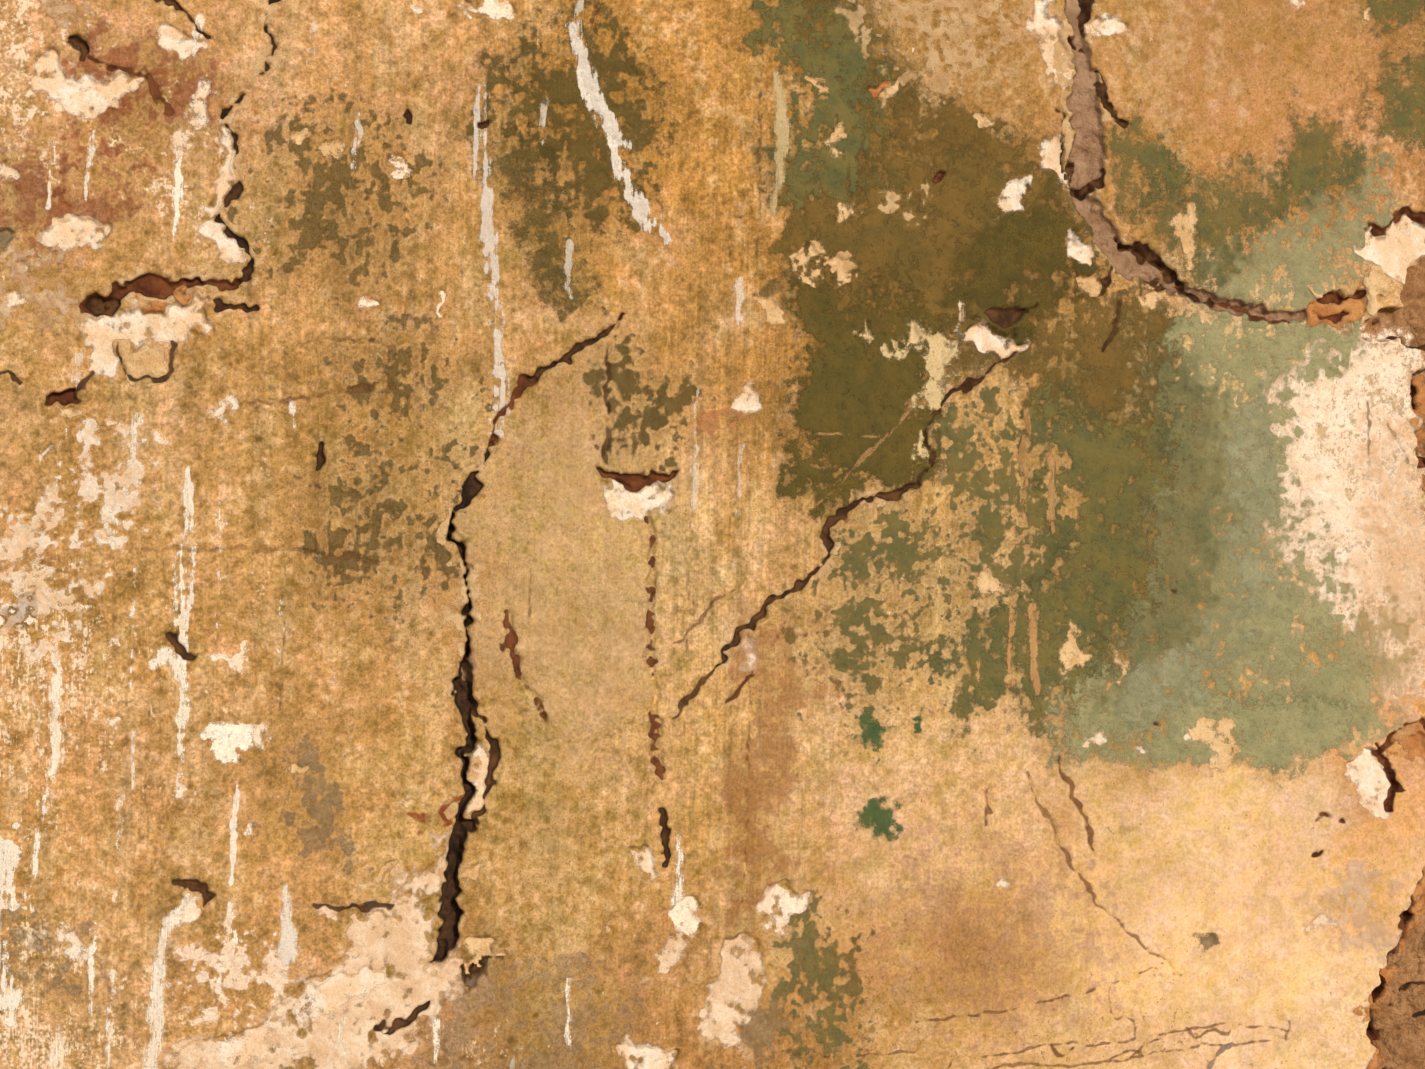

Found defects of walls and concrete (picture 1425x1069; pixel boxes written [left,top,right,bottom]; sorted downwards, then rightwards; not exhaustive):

spalling [0,213,212,388]
crack [67,0,291,327]
damp [565,0,672,245]
peeling [697,0,1425,819]
crack [1053,0,1307,352]
damp [0,413,169,1028]
damp [149,463,271,780]
crack [419,312,625,976]
crack [648,347,1032,868]
damp [143,785,312,1069]
spalling [163,831,505,1069]
peeling [697,883,878,1069]